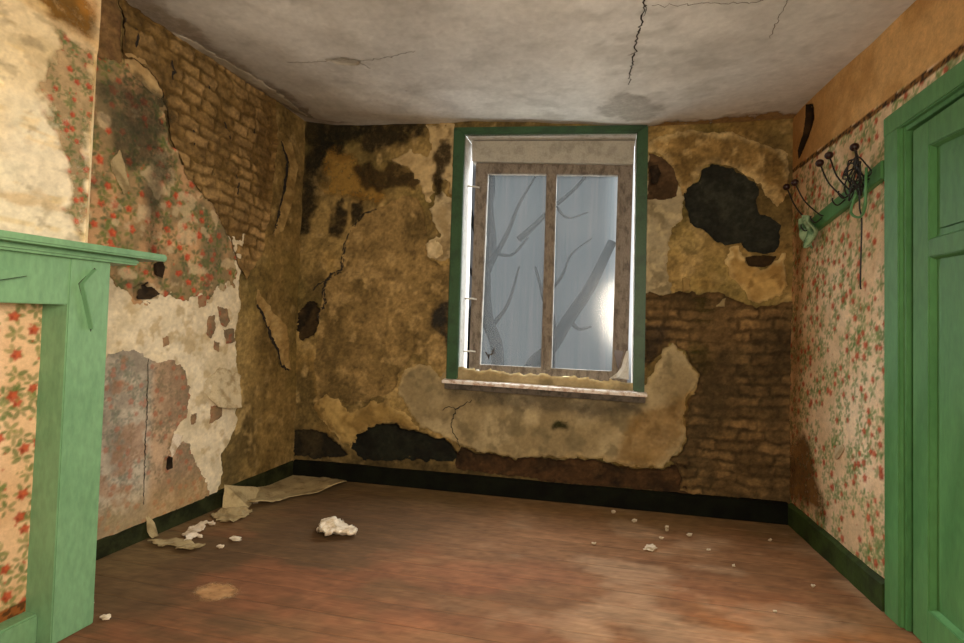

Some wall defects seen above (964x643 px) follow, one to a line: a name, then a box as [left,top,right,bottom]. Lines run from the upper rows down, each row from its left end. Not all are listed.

flaking render [97,0,308,495]
spalling [256,123,455,404]
damp [300,121,425,238]
damp [432,141,451,196]
flaking render [455,129,793,504]
crack [628,0,788,85]